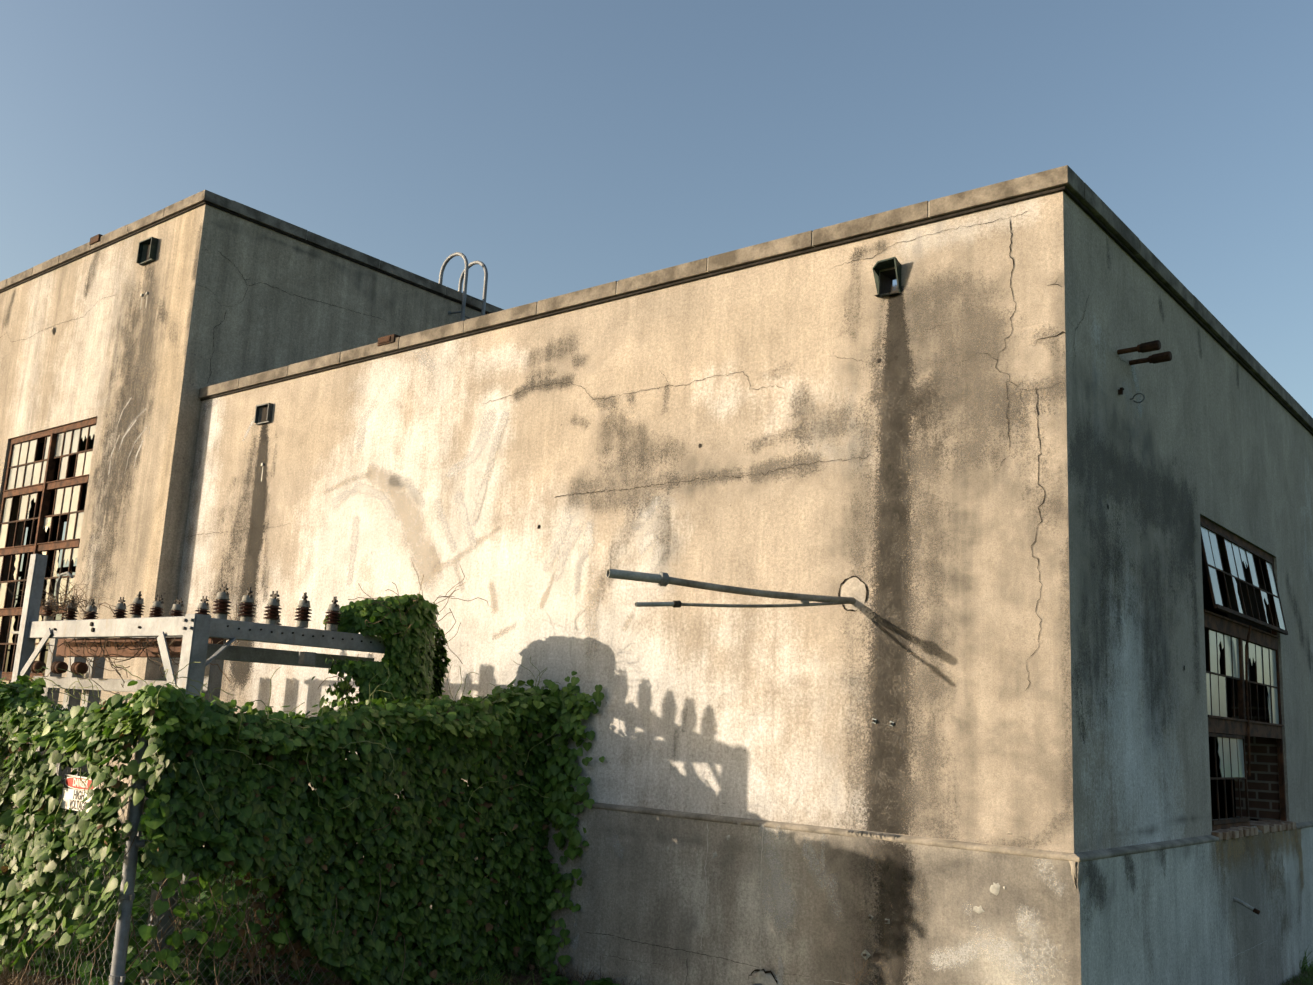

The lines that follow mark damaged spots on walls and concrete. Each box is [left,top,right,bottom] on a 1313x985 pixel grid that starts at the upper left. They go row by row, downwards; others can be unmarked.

water stain [90,263,167,603]
water stain [221,640,254,702]
water stain [215,421,269,621]
water stain [332,340,583,585]
crack [556,454,870,497]
water stain [540,271,1066,985]
crack [835,211,1089,692]
water stain [992,528,1125,847]